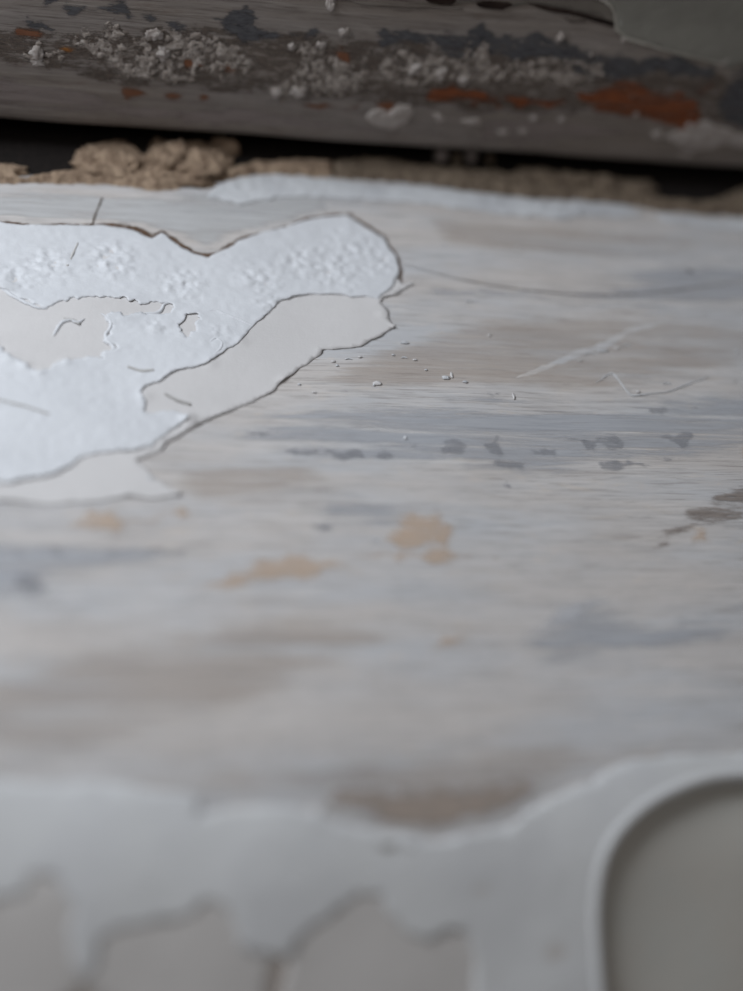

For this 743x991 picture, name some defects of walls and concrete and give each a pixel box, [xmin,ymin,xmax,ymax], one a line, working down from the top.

peeling [455,0,743,68]
spalling [0,137,743,218]
peeling [0,213,413,506]